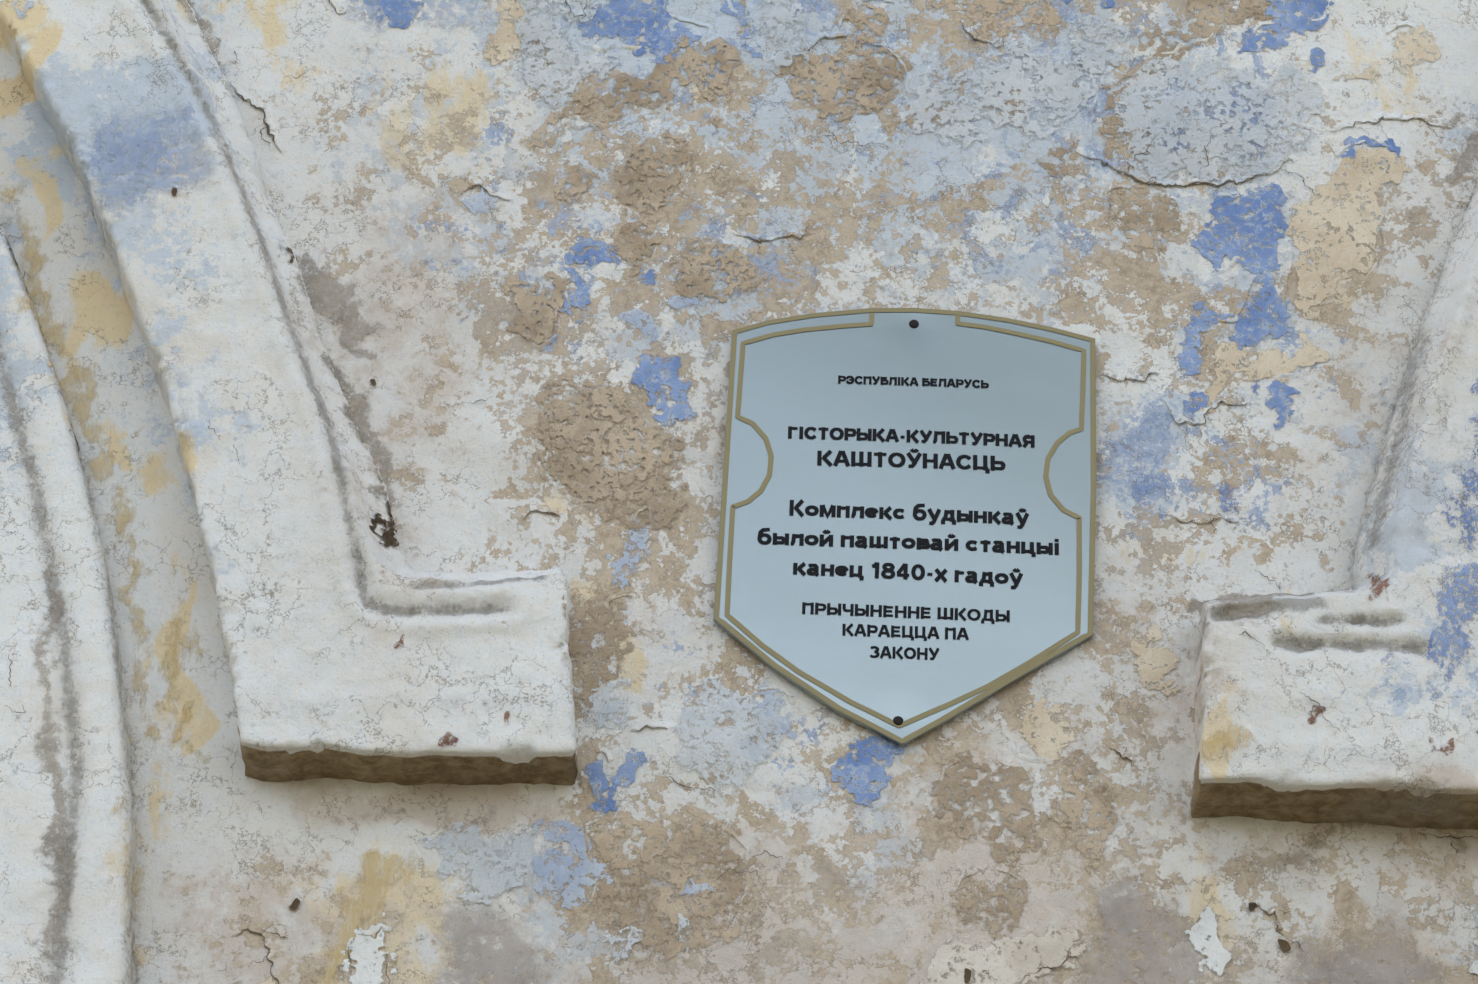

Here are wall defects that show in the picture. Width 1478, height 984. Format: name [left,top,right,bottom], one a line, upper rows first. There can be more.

crack [212,35,287,153]
crack [1069,112,1452,195]
peeling [351,0,1447,430]
spalling [419,308,756,965]
peeling [672,676,806,800]
rust [1308,705,1326,724]
spalling [920,696,1122,984]
crack [218,922,287,984]
peeling [340,912,397,984]
crack [1019,941,1082,984]
peeling [1184,906,1233,976]
crack [1252,898,1304,952]